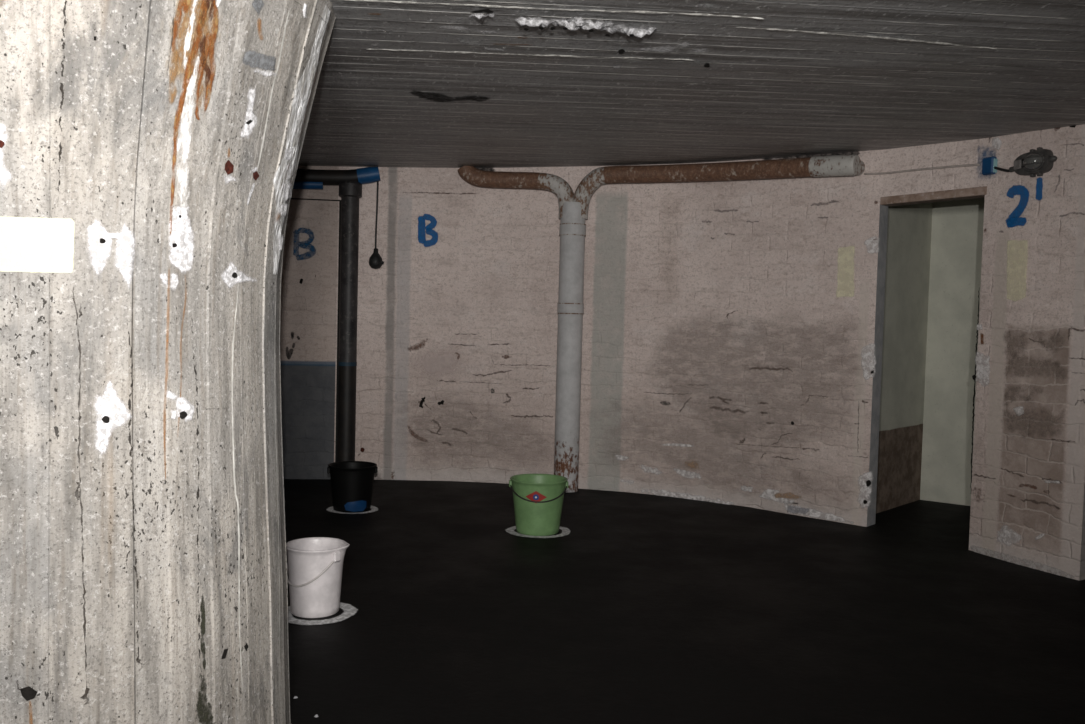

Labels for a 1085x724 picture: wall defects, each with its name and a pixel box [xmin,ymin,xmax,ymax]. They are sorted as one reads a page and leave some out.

rust [169,0,221,140]
spalling [516,17,710,67]